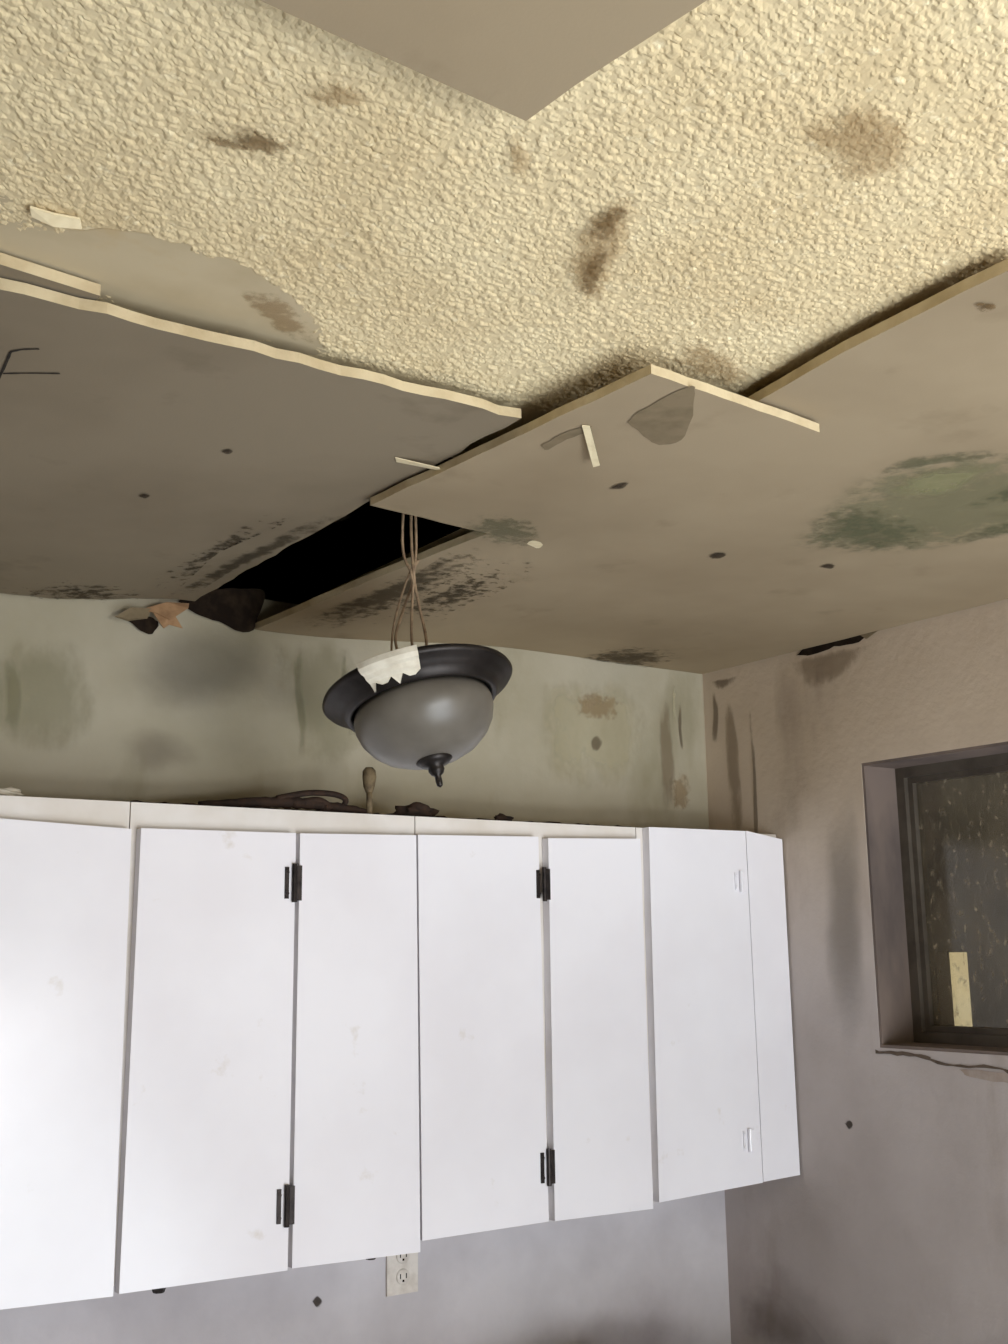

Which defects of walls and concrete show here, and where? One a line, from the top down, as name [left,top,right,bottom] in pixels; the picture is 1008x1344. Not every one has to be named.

crack [875,1050,1008,1083]